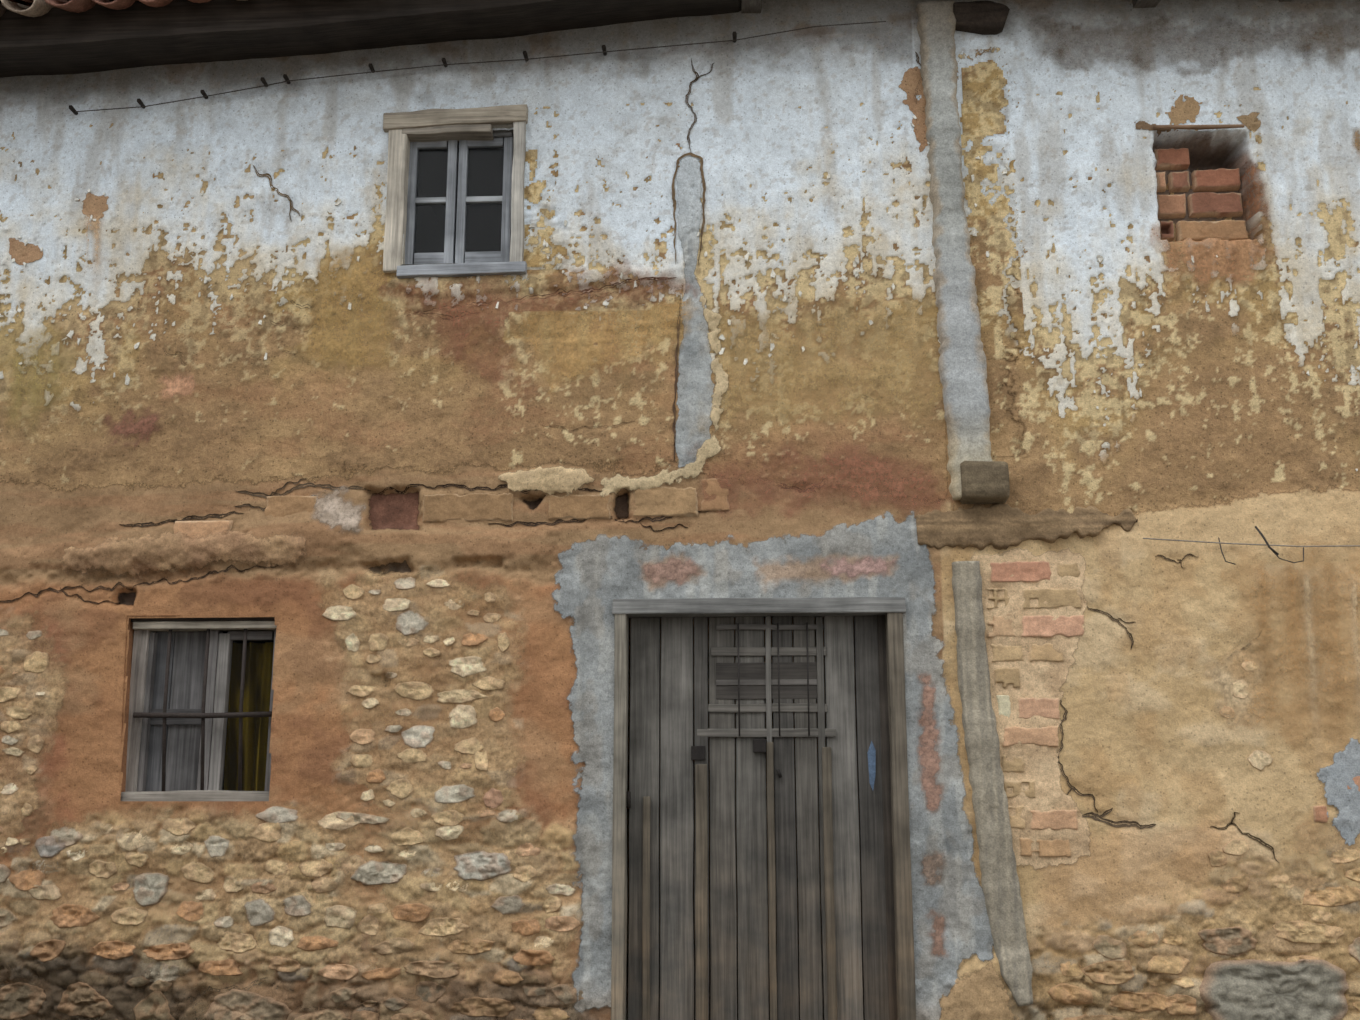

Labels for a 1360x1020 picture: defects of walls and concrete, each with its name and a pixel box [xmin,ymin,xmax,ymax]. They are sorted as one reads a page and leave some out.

crack [685,58,714,150]
crack [253,165,300,220]
peeling [0,47,1360,532]
flaking render [173,520,233,539]
crack [119,477,708,532]
crack [0,565,278,604]
crack [1087,606,1134,649]
flaking render [970,548,1091,870]
crack [1058,700,1155,829]
crack [1211,812,1279,863]
flaking render [1033,823,1360,1020]